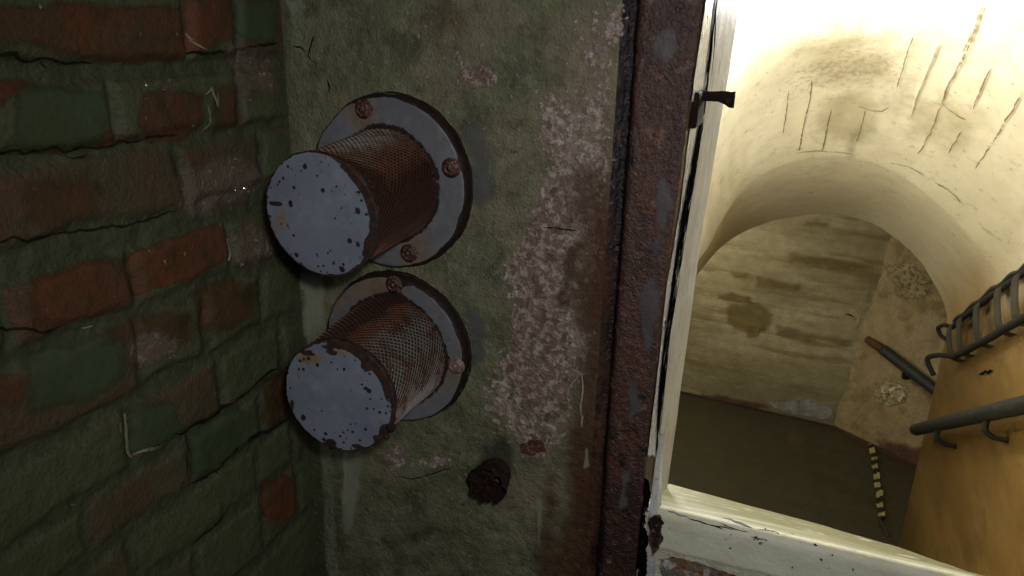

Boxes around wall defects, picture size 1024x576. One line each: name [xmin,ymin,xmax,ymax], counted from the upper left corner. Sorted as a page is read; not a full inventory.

crack [0,51,92,69]
crack [0,134,179,159]
peeling [480,2,629,460]
leakage [719,293,851,346]
crack [172,368,290,487]
rust [648,515,664,556]